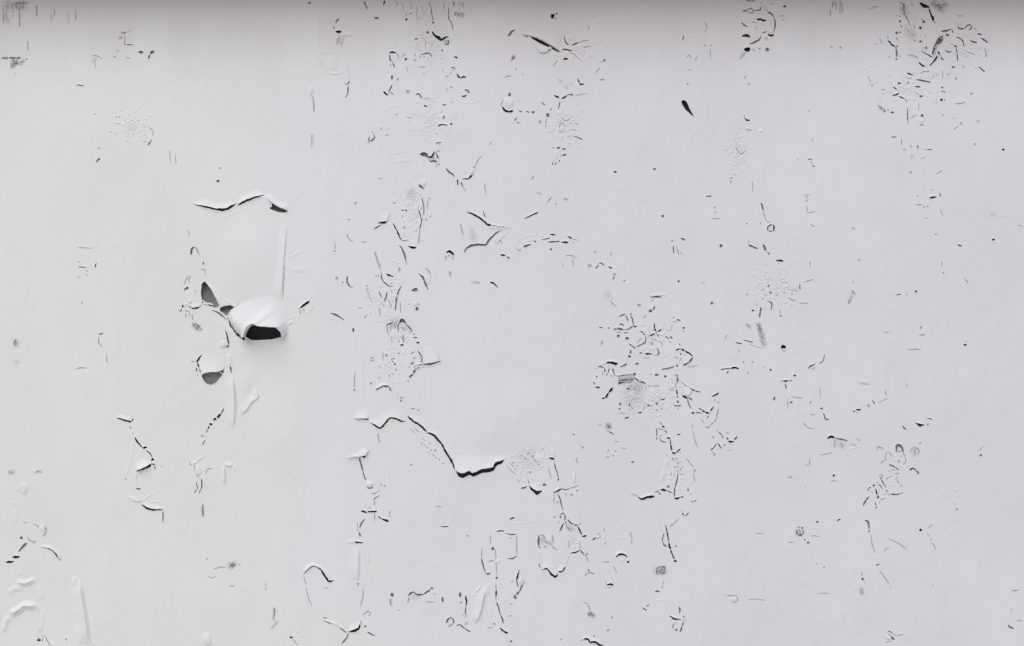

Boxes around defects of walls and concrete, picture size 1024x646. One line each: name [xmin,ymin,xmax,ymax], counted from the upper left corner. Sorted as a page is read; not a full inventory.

peeling [739,0,787,60]
peeling [867,2,990,116]
peeling [538,92,588,185]
peeling [179,189,308,349]
peeling [411,268,432,297]
peeling [599,293,673,346]
peeling [347,312,579,512]
peeling [592,359,668,420]
peeling [681,382,738,456]
peeling [124,426,165,522]
peeling [659,446,697,503]
crack [553,512,614,588]